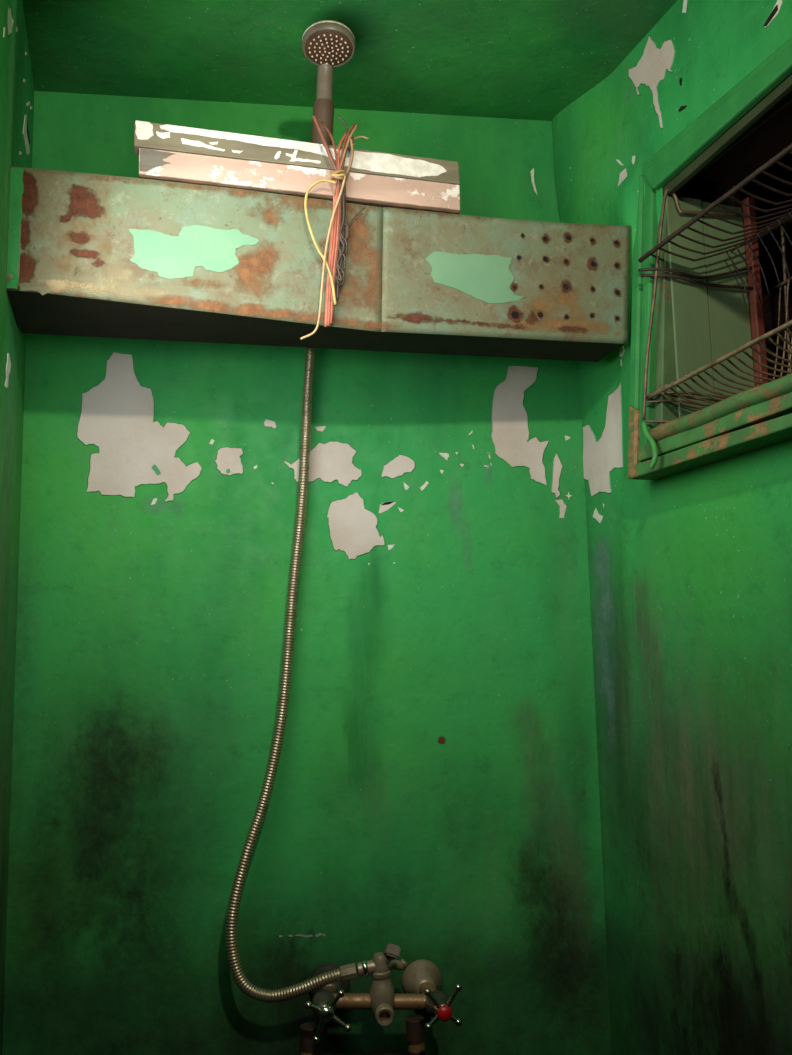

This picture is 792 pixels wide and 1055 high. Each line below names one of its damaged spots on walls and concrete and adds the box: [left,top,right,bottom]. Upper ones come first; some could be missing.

peeling [628,35,682,129]
peeling [76,352,203,505]
peeling [209,439,257,476]
peeling [283,426,404,564]
peeling [381,454,429,491]
peeling [484,365,572,518]
peeling [582,383,624,524]